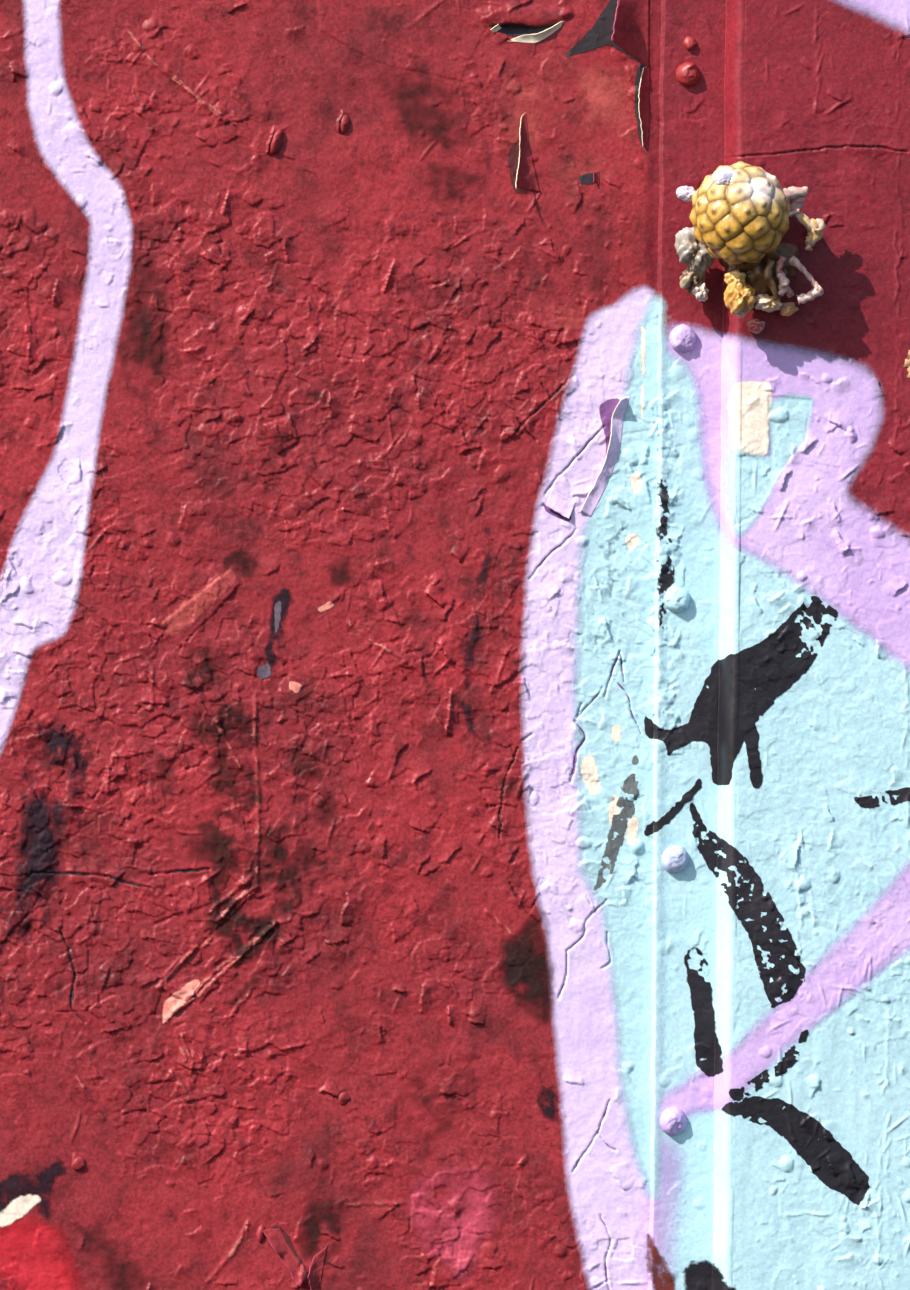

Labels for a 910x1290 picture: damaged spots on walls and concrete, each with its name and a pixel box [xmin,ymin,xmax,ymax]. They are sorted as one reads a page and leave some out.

peeling [490,21,564,43]
peeling [566,0,649,153]
peeling [508,112,540,193]
peeling [544,326,646,522]
peeling [726,381,813,536]
peeling [625,533,640,550]
peeling [611,724,621,742]
peeling [581,754,639,844]
peeling [263,1225,327,1290]